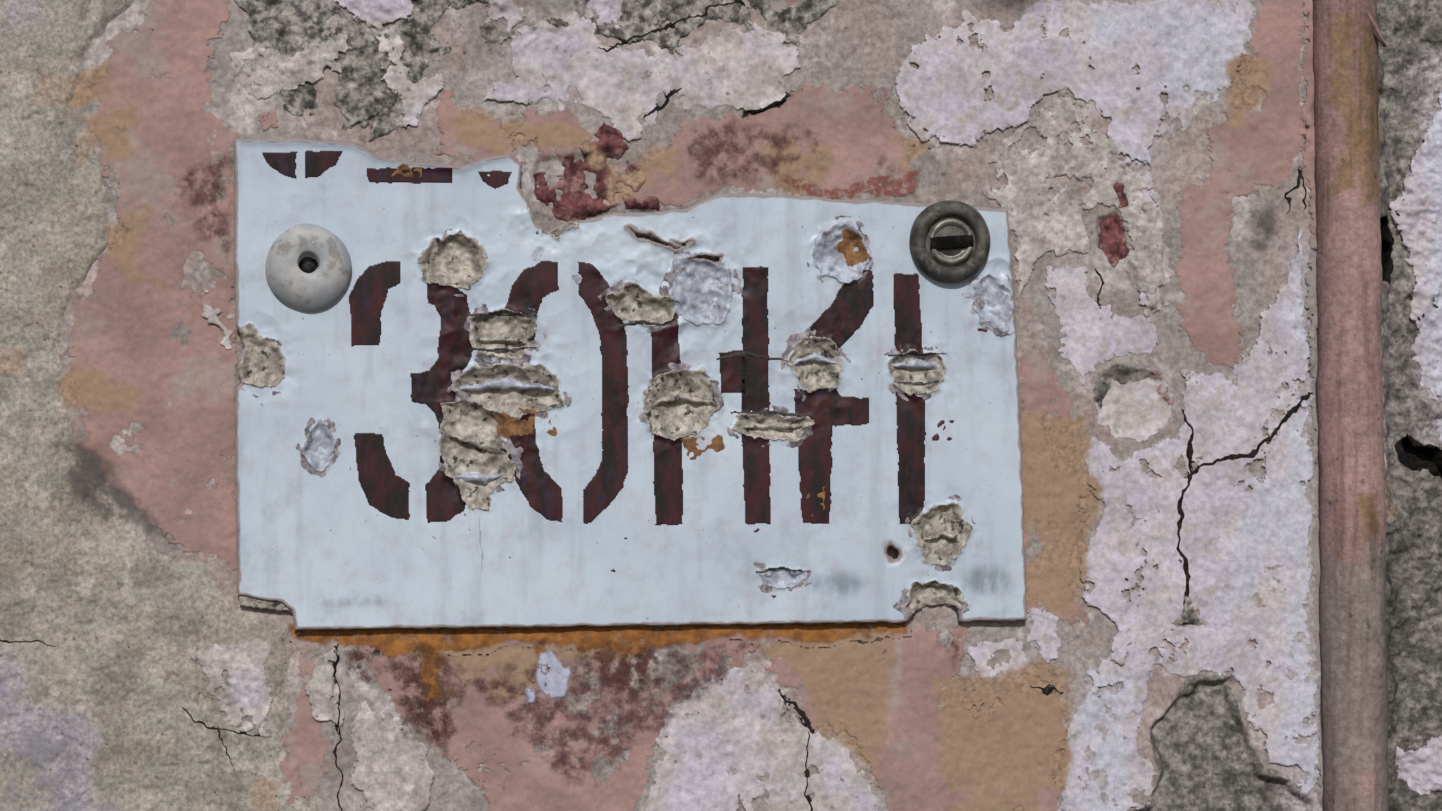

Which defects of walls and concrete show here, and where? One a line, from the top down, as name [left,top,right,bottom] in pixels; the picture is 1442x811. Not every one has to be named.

peeling [59,0,916,571]
peeling [1380,90,1442,401]
peeling [351,0,1321,811]
crack [1176,392,1315,625]
spalling [1394,418,1442,479]
peeling [189,638,273,737]
peeling [280,631,345,808]
crack [332,644,343,811]
corrosion [290,622,906,774]
crack [778,688,815,811]